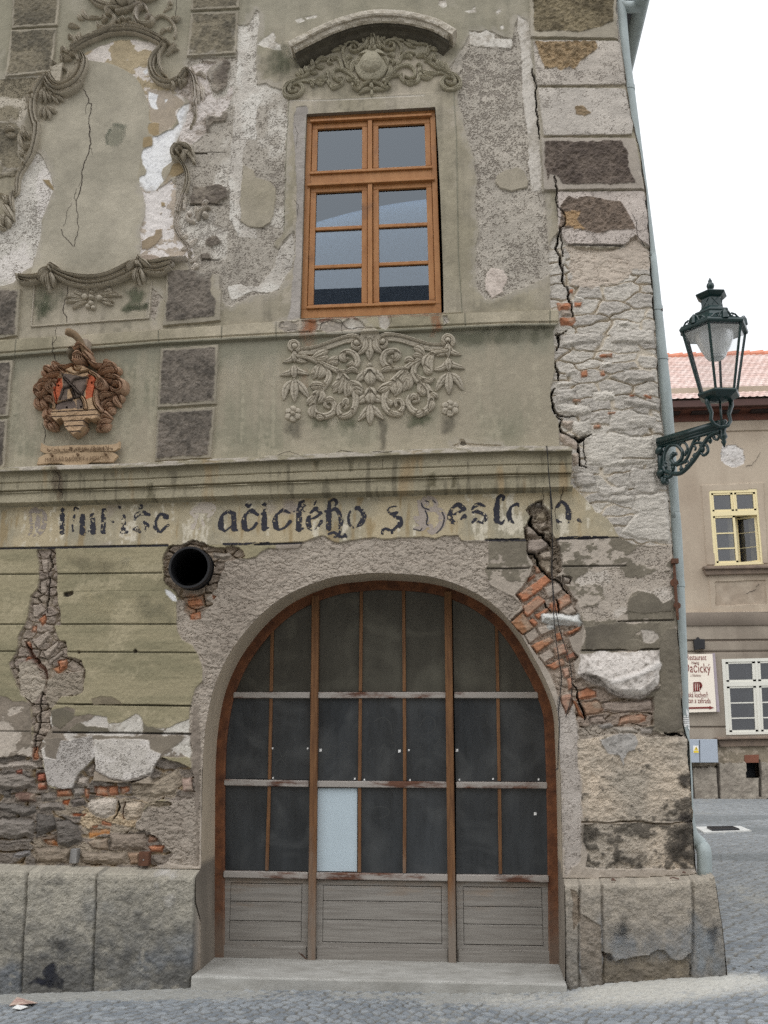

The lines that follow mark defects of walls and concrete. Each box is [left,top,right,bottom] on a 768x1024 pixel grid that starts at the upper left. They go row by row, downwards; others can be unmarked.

flaking render [0,77,55,286]
crack [61,89,93,246]
flaking render [85,10,296,307]
crack [532,69,540,140]
crack [528,176,592,614]
flaking render [450,9,686,739]
spalling [163,539,245,620]
crack [28,646,48,742]
crack [572,684,587,720]
flaking render [0,695,196,868]
leakage [671,813,691,857]